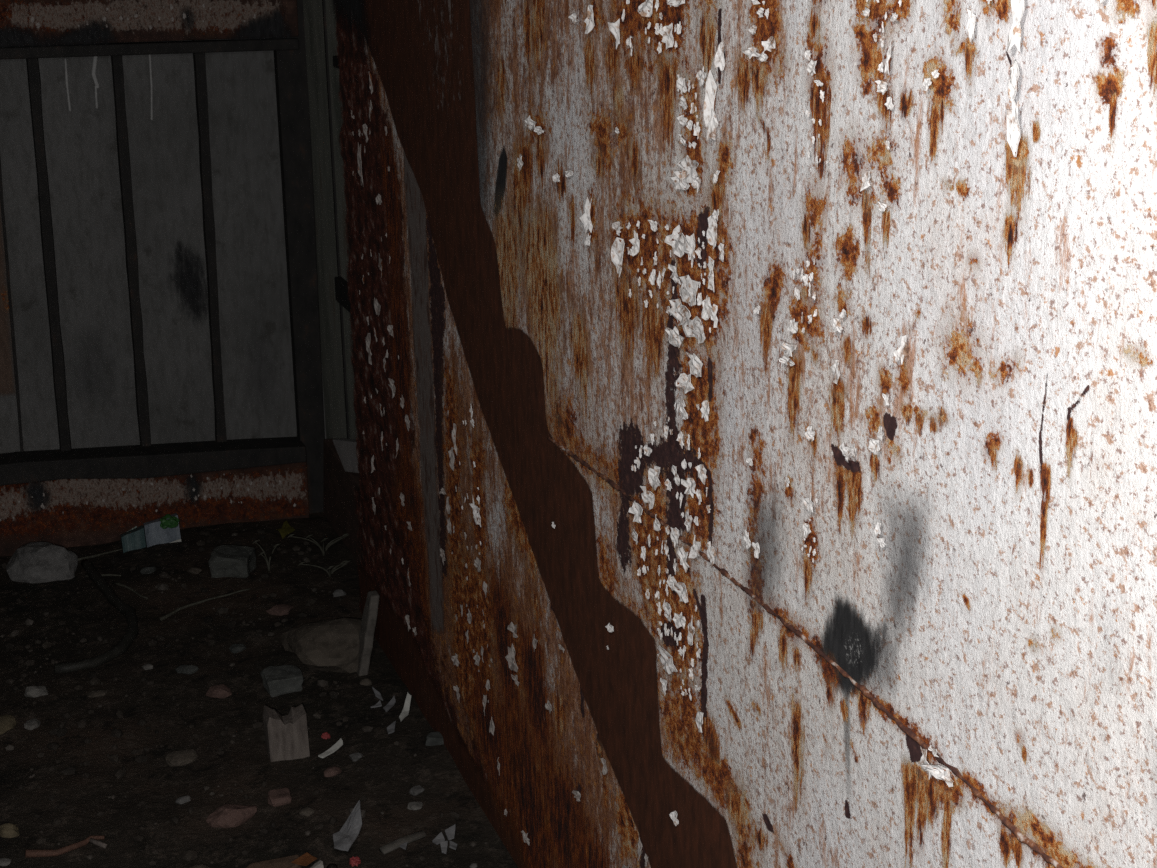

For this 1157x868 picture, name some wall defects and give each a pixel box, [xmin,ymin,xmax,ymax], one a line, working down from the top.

corrosion [737,52,790,160]
corrosion [1095,36,1124,138]
corrosion [1097,0,1157,97]
corrosion [753,0,977,448]
corrosion [351,0,760,868]
peeling [615,0,735,733]
crack [700,358,713,422]
corrosion [934,317,1020,386]
crack [698,459,716,565]
corrosion [1014,455,1051,569]
corrosion [791,694,805,810]
corrosion [962,767,1098,868]